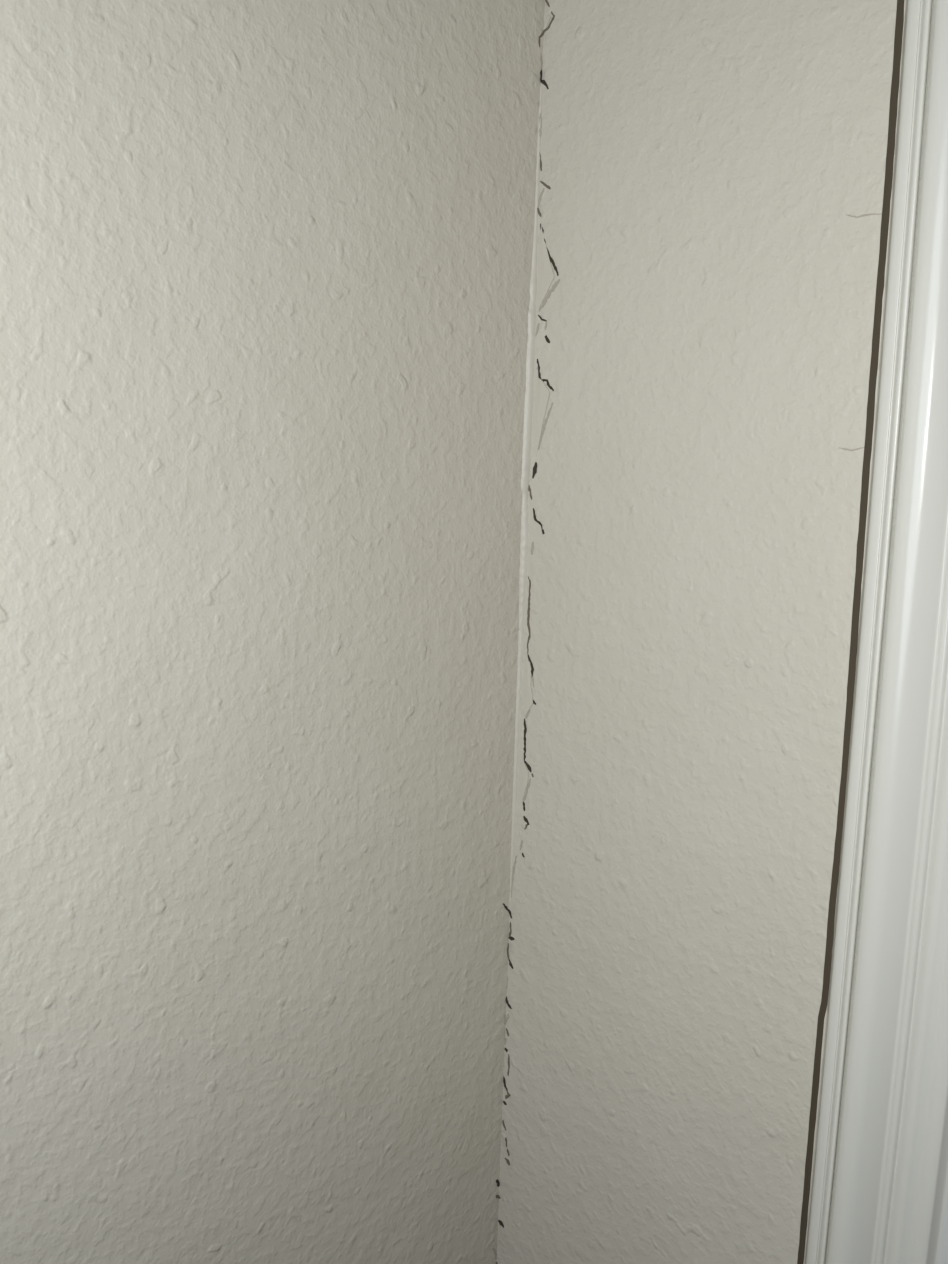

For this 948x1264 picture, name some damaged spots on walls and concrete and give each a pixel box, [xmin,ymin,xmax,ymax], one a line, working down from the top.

crack [492,0,560,1264]